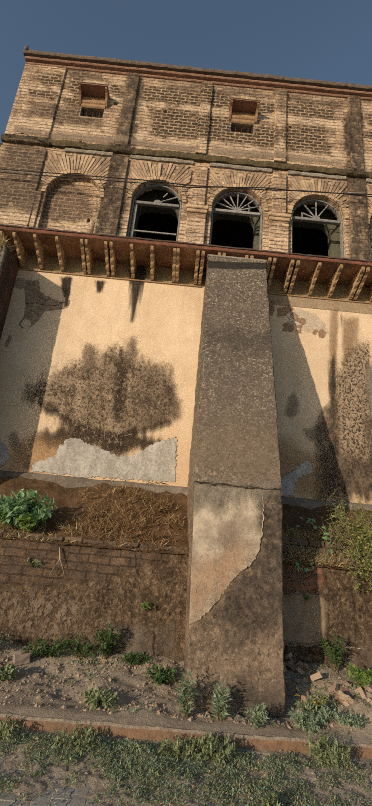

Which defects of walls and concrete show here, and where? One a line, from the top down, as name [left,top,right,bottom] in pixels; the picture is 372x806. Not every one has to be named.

spalling [15,278,70,329]
water stain [61,277,72,307]
water stain [130,265,145,321]
peeling [269,300,327,338]
water stain [12,344,176,469]
water stain [278,310,372,502]
peeling [187,482,273,626]